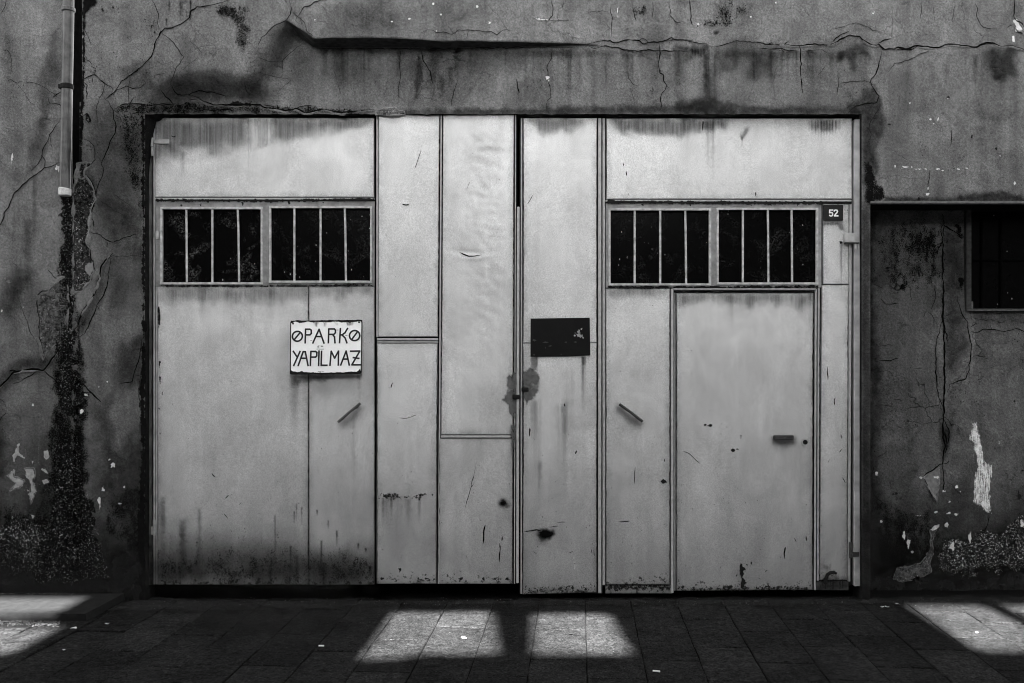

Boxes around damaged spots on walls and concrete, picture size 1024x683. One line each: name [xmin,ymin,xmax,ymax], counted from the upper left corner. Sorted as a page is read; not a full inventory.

crack [0,0,1024,420]
water stain [0,247,91,532]
peeling [0,438,110,585]
crack [874,214,1024,497]
peeling [893,467,1024,583]